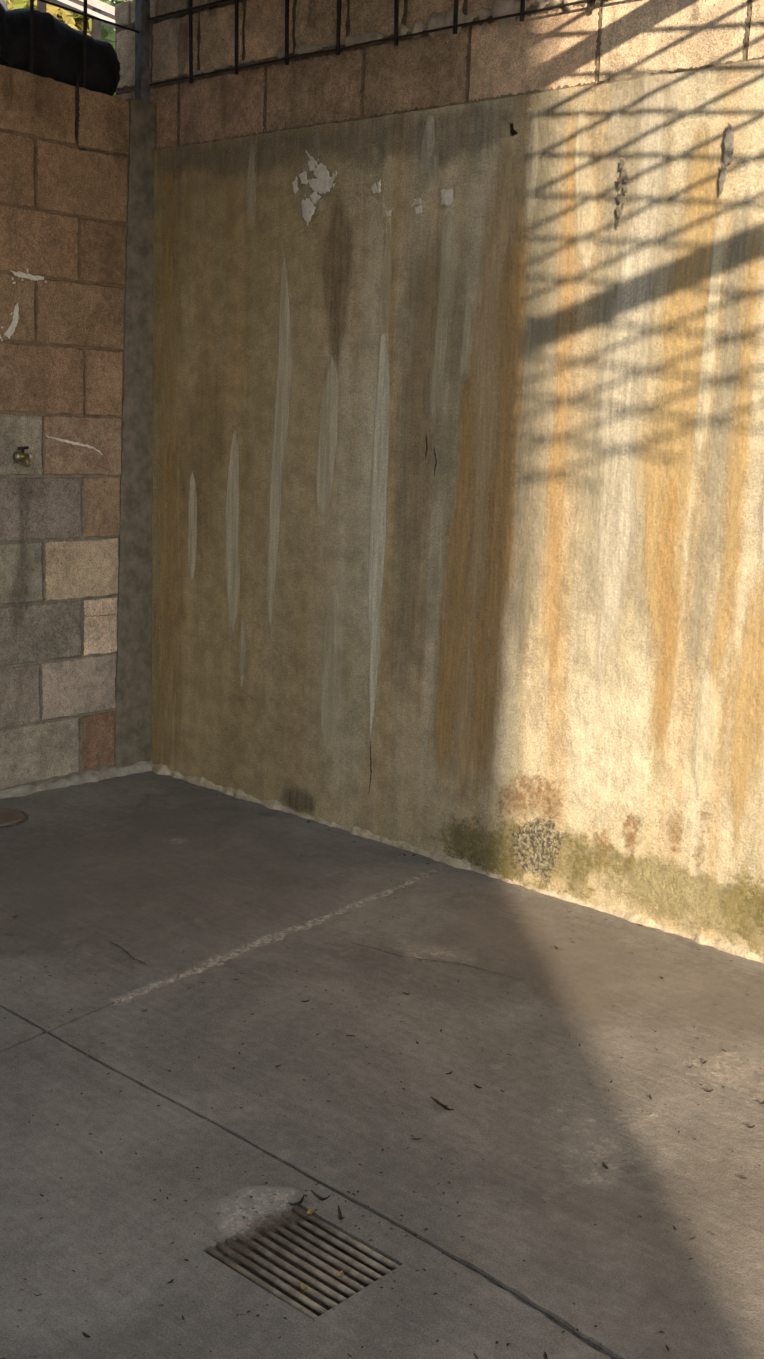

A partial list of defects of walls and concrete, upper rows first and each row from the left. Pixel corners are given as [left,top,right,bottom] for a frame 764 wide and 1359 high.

peeling [292,150,337,226]
peeling [0,303,19,341]
peeling [12,268,47,284]
leakage [268,259,291,628]
leakage [317,357,338,518]
corrosion [645,144,718,734]
leakage [188,472,197,581]
leakage [225,430,245,668]
leakage [368,323,390,736]
leakage [511,816,565,881]